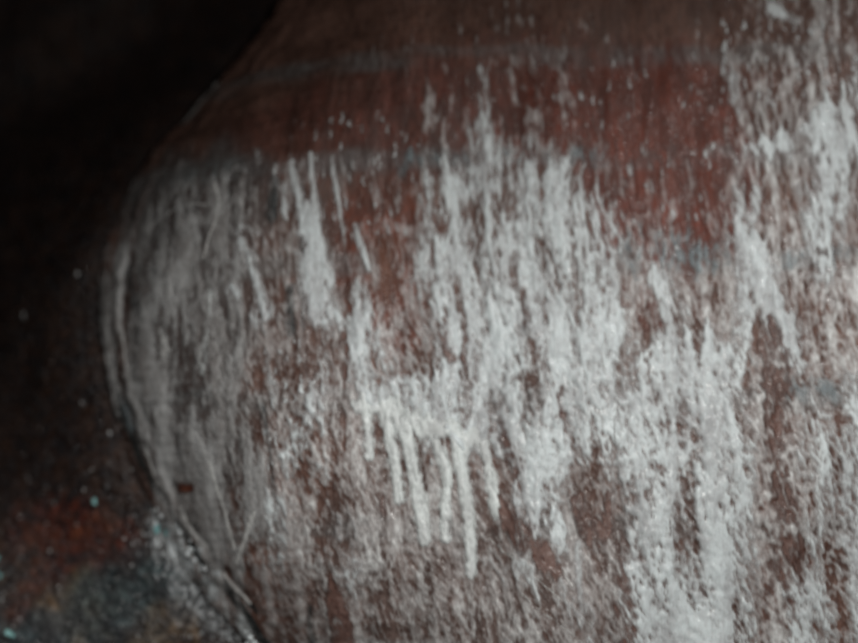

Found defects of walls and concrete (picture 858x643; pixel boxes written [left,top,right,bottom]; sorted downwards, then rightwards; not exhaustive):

leakage [99,65,858,643]
leakage [720,19,750,114]